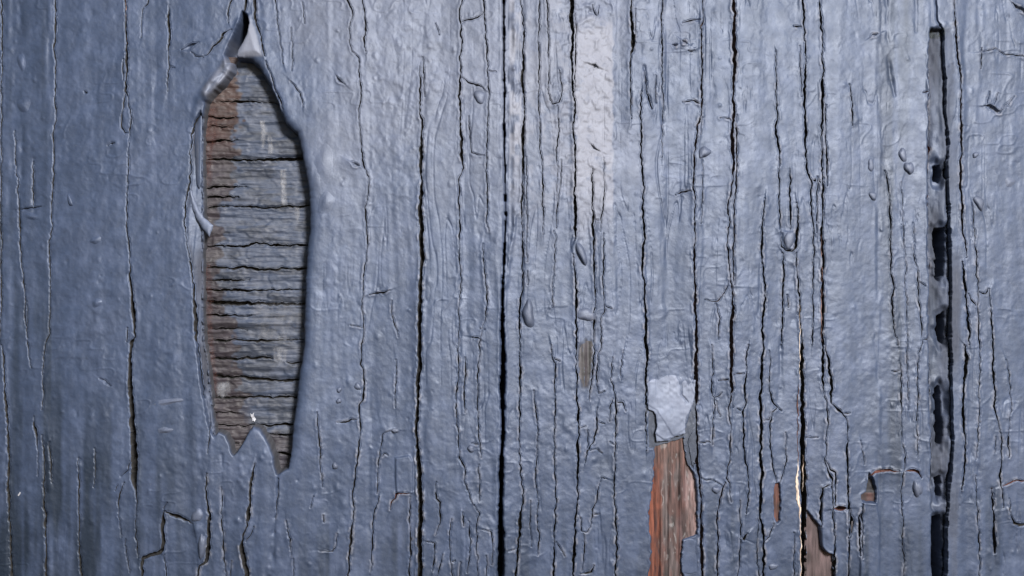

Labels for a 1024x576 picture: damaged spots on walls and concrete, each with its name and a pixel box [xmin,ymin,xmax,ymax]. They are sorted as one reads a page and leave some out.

crack [0,0,58,576]
crack [77,0,310,576]
peeling [190,116,214,237]
crack [310,0,932,576]
peeling [646,375,697,576]
peeling [804,510,834,576]
crack [953,0,1024,576]